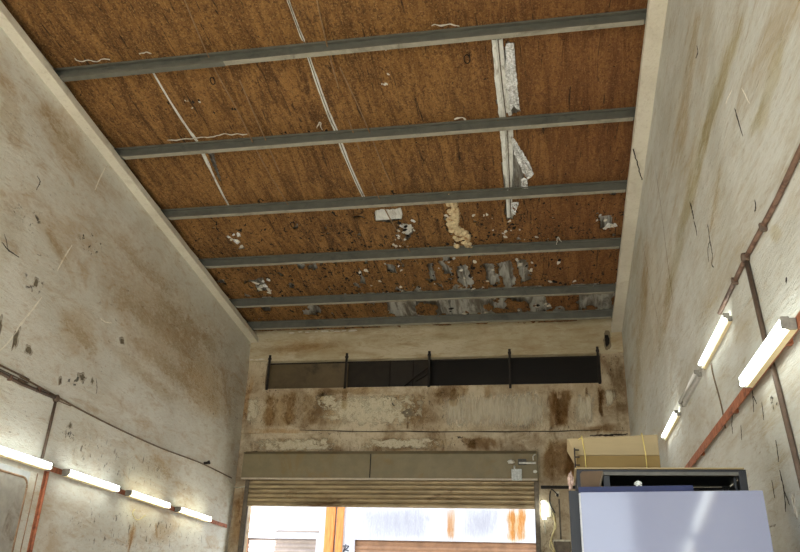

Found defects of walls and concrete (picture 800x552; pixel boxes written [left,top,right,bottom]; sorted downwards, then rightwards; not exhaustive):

peeling [337,219,418,250]
crack [690,203,714,268]
peeling [432,257,504,290]
peeling [515,258,576,285]
water stain [316,395,422,425]
water stain [446,393,542,426]
water stain [256,438,334,451]
water stain [366,438,444,449]